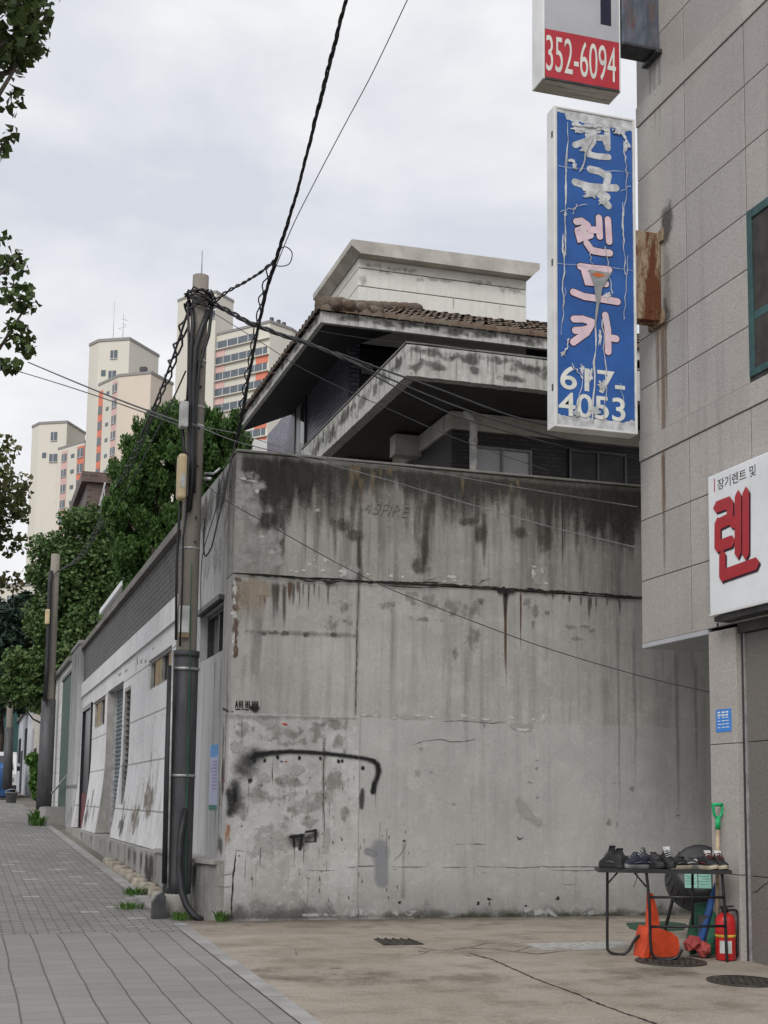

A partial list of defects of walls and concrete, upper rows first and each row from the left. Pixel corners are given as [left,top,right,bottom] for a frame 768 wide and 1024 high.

water stain [201,347,641,572]